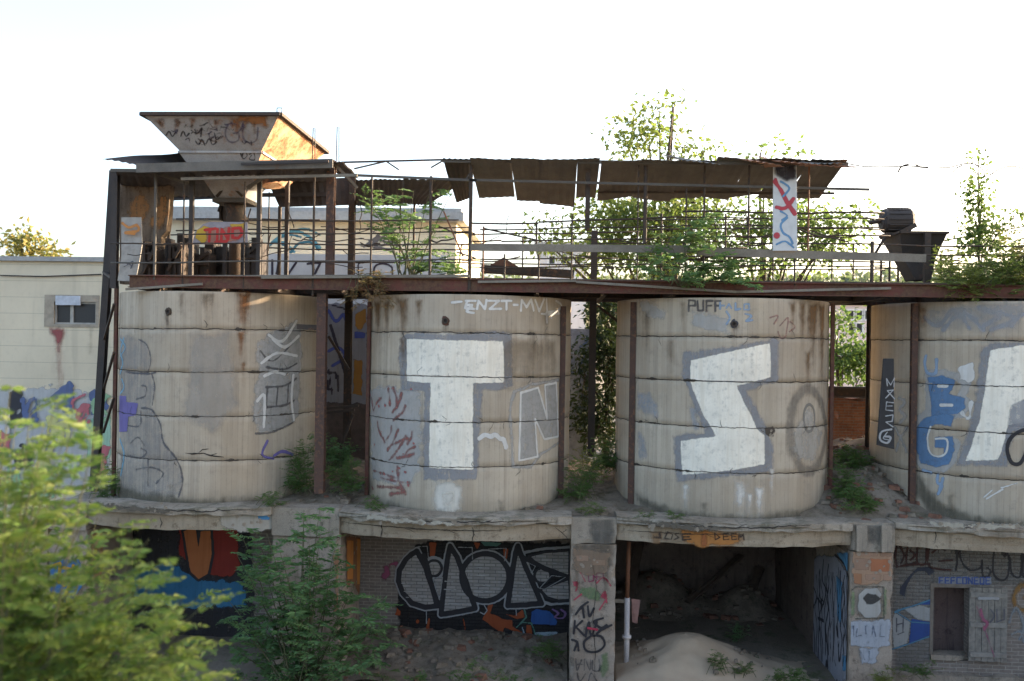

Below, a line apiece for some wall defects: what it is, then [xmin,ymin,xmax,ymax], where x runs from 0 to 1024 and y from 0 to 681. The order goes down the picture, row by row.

corrosion [240,293,249,318]
damp [791,304,824,368]
spalling [367,513,457,526]